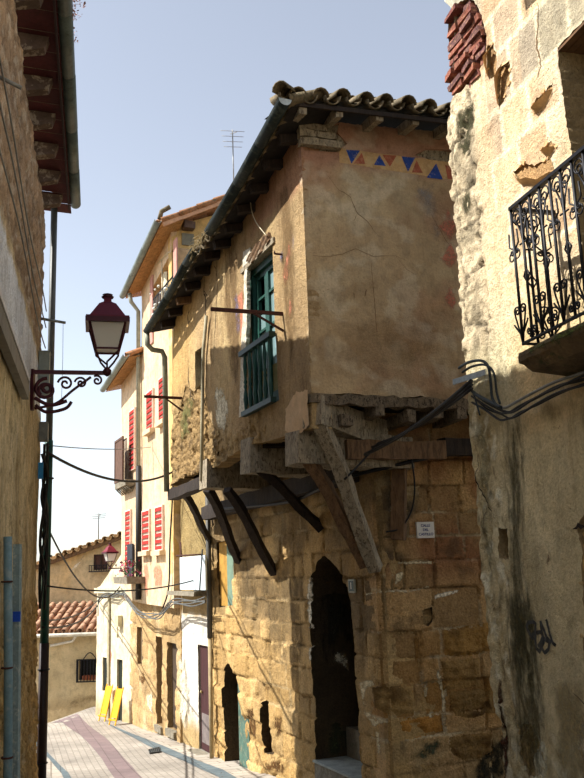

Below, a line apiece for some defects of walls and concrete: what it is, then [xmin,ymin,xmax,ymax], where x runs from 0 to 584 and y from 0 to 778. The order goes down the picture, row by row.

flaking render [444,0,511,106]
crack [534,3,542,79]
flaking render [531,85,553,115]
flaking render [513,140,558,187]
flaking render [170,385,221,479]
damp [505,427,545,778]